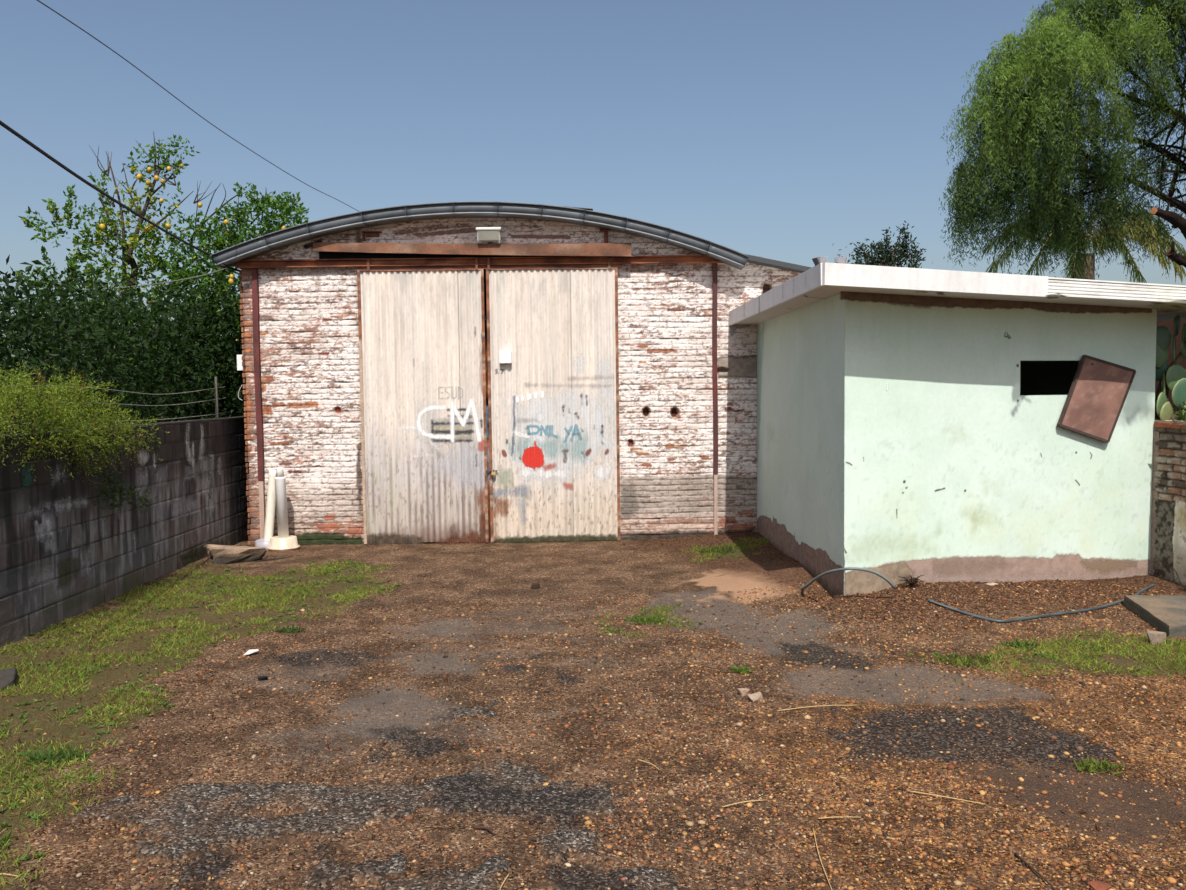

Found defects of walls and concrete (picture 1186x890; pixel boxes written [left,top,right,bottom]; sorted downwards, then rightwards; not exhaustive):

peeling [243,321,268,353]
peeling [638,344,677,363]
peeling [245,368,318,451]
water stain [173,425,213,516]
peeling [627,440,651,466]
water stain [33,500,86,547]
corrosion [441,492,507,544]
flaking render [647,509,914,597]